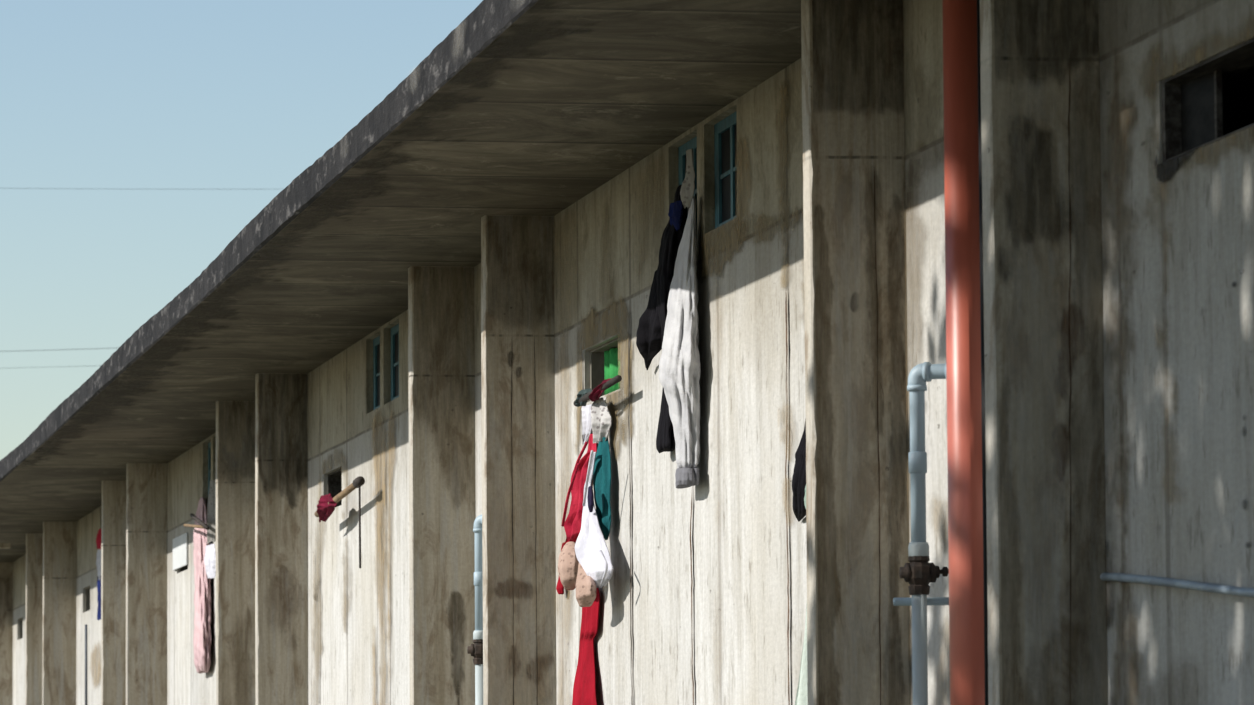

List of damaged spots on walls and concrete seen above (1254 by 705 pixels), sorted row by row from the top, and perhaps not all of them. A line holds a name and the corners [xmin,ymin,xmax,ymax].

water stain [22,0,589,465]
water stain [450,592,463,705]